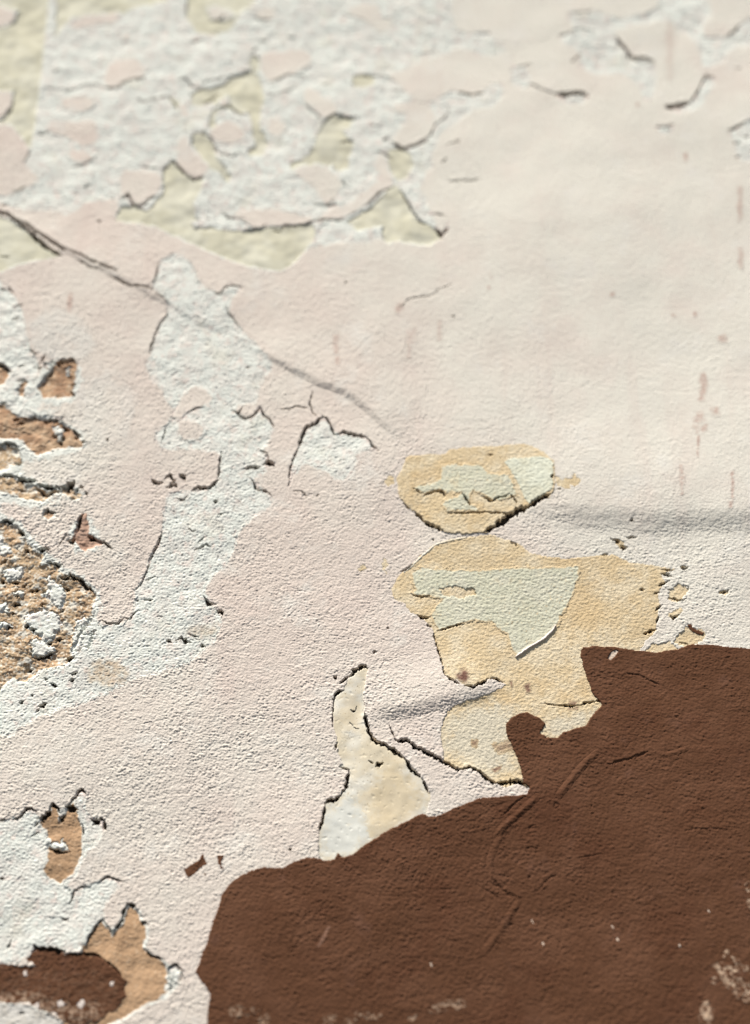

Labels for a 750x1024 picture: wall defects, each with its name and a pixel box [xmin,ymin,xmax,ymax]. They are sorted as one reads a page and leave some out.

crack [1,213,168,303]
peeling [0,0,750,521]
peeling [0,789,184,1024]
peeling [0,253,276,740]
peeling [318,666,430,861]
peeling [381,444,706,788]